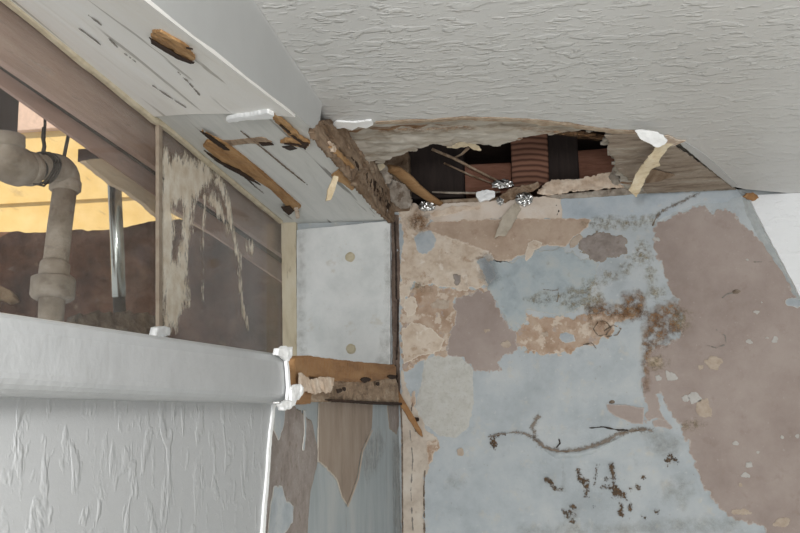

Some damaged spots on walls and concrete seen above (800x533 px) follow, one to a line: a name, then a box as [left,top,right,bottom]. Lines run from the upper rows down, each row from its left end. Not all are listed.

peeling [226,109,274,123]
spalling [200,129,301,219]
peeling [629,129,673,197]
damp [200,171,249,330]
damp [559,289,655,324]
peeling [387,203,634,533]
peeling [266,402,373,533]
crack [488,415,653,453]
peeling [606,400,644,424]